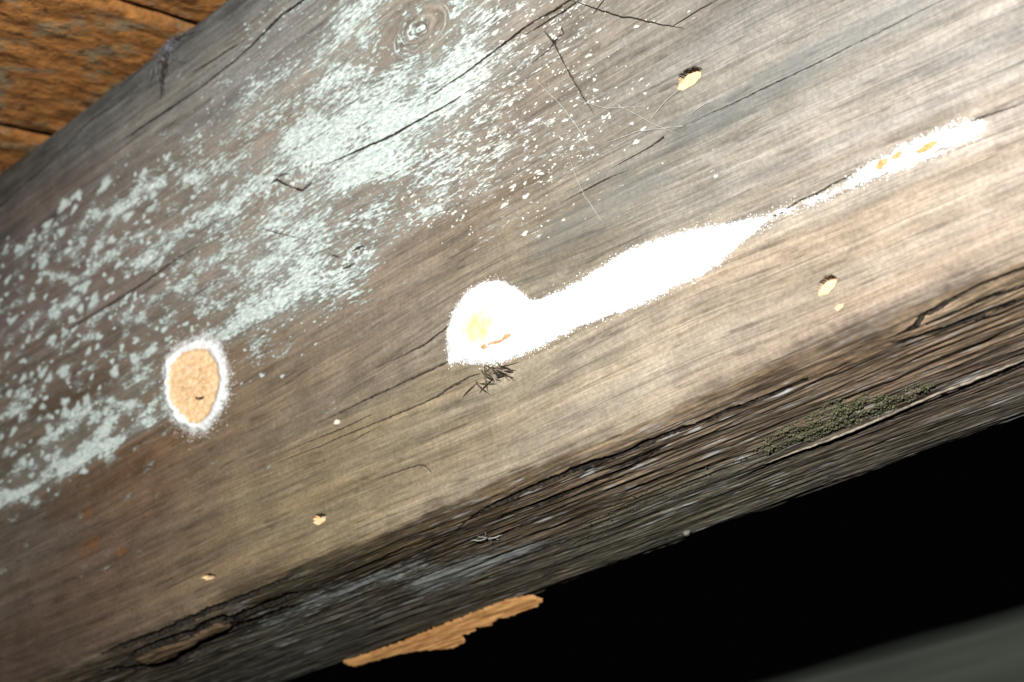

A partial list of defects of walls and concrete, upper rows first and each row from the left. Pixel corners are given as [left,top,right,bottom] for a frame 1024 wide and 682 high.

crack [271,0,595,191]
leakage [444,114,991,369]
crack [890,267,1024,343]
leakage [156,326,237,441]
crack [96,576,317,671]